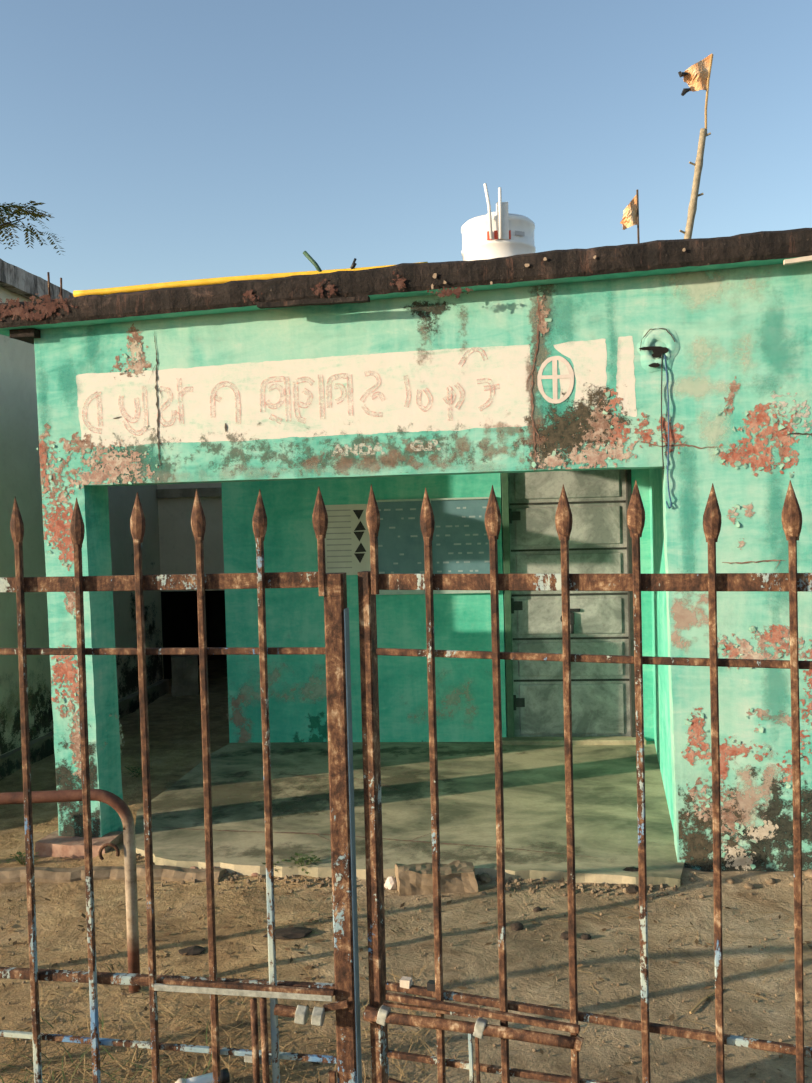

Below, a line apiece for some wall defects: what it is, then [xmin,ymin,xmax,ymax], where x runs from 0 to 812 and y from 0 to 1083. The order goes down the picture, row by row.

peeling [0,272,78,321]
crack [152,336,163,471]
damp [404,299,466,338]
rust [526,284,554,470]
peeling [529,386,684,470]
peeling [713,376,812,478]
peeling [36,423,159,571]
damp [116,593,163,719]
damp [0,685,100,838]
damp [678,764,812,872]
peeling [681,624,812,871]